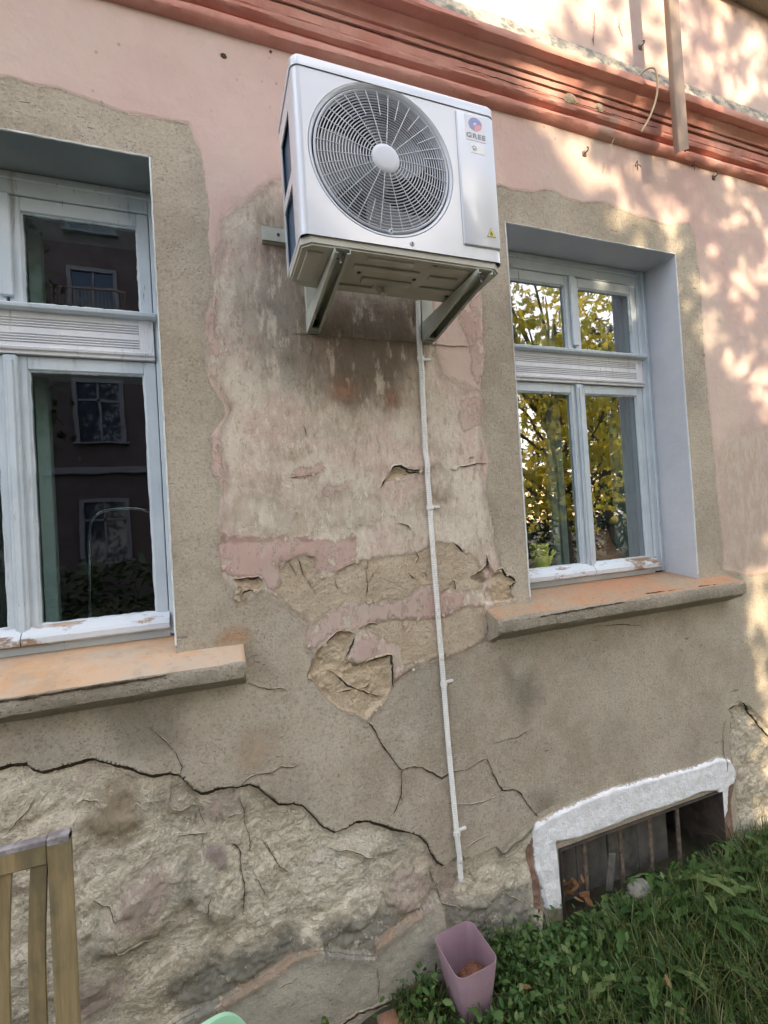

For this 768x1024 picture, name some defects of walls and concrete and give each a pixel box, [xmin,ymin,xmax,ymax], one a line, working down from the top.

peeling [205,179,516,723]
crack [380,463,420,488]
crack [0,721,539,912]